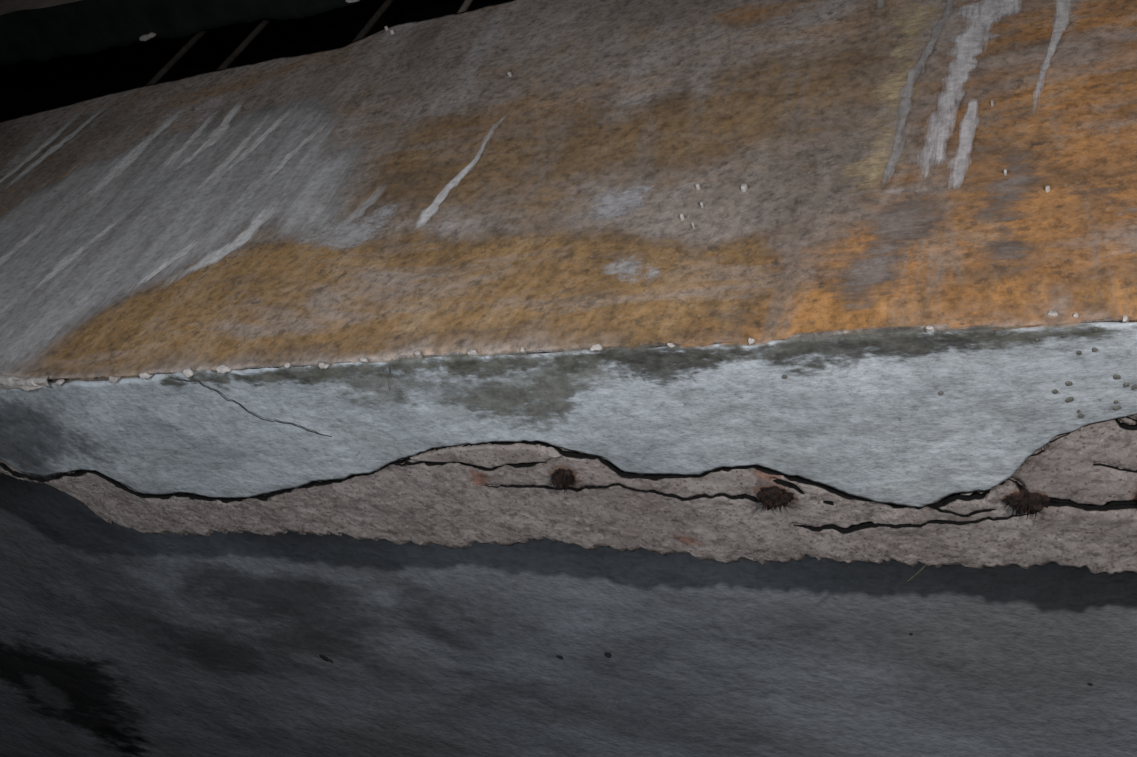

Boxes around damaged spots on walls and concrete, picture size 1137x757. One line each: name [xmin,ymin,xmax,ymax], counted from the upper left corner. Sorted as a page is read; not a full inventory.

water stain [848,0,1019,187]
water stain [1035,0,1071,98]
rust [33,0,1137,376]
crack [176,379,332,437]
flaking render [0,310,1137,576]
crack [0,417,1137,534]
rust [756,486,797,511]
rust [1001,487,1052,522]